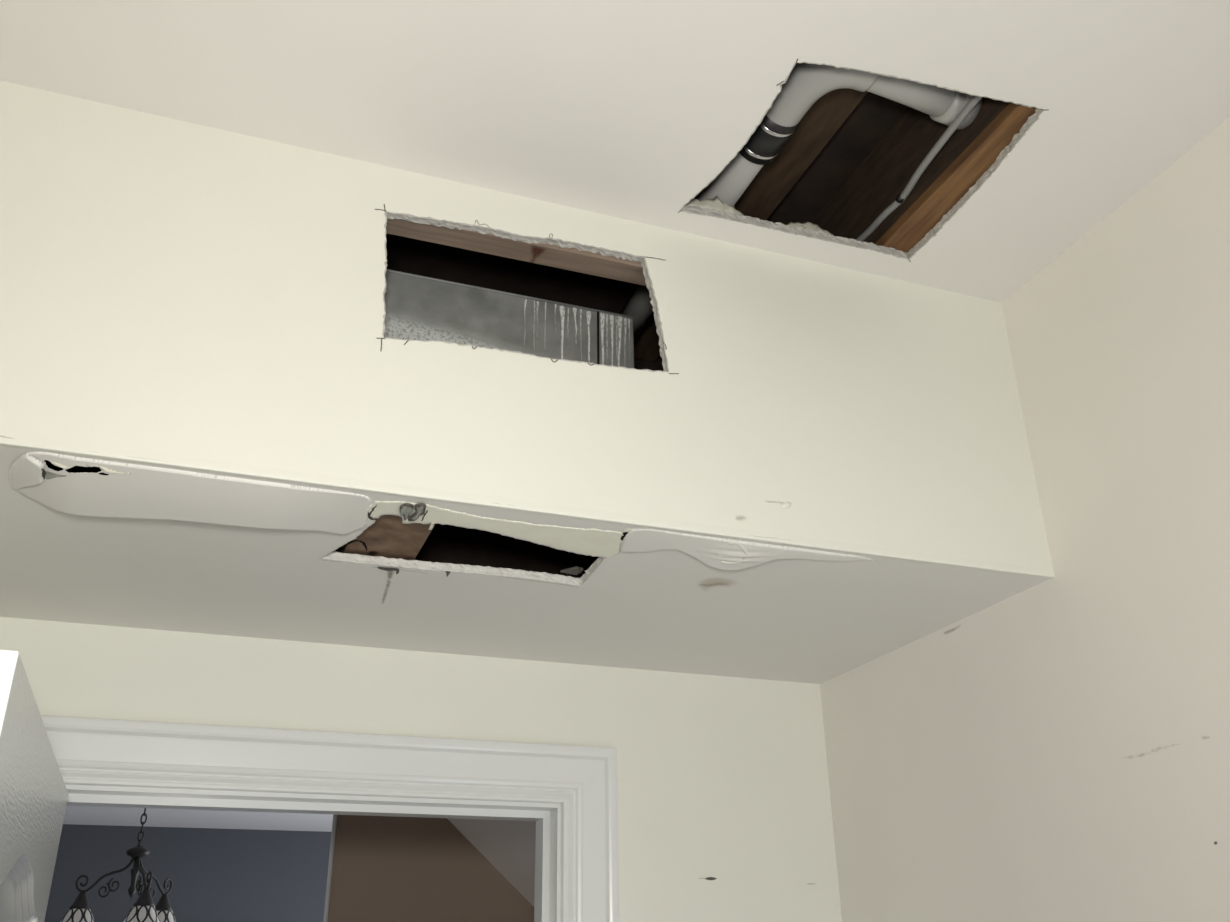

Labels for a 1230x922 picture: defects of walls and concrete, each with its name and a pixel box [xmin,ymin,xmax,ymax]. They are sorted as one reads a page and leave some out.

spalling [634,356,664,371]
spalling [44,460,103,473]
spalling [368,501,634,578]